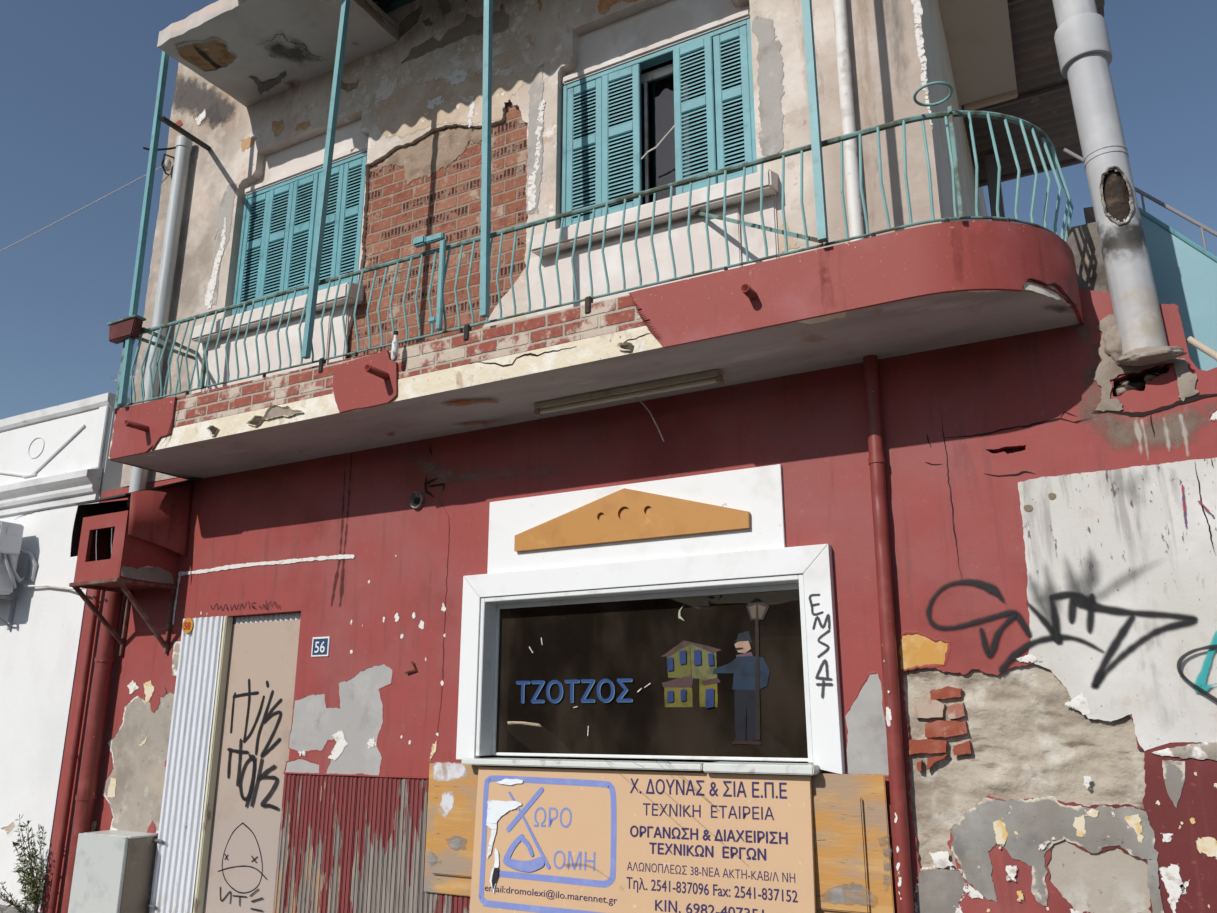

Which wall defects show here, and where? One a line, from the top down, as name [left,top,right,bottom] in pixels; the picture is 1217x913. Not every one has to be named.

water stain [173,78,234,126]
spalling [175,37,238,72]
peeling [752,16,785,156]
spalling [346,0,546,359]
peeling [205,183,236,309]
crack [1023,278,1078,306]
hole [1113,371,1167,397]
peeling [1207,406,1217,422]
crack [925,394,1217,577]
flaking render [91,640,181,834]
flaking render [284,662,394,777]
peeling [842,457,1217,913]